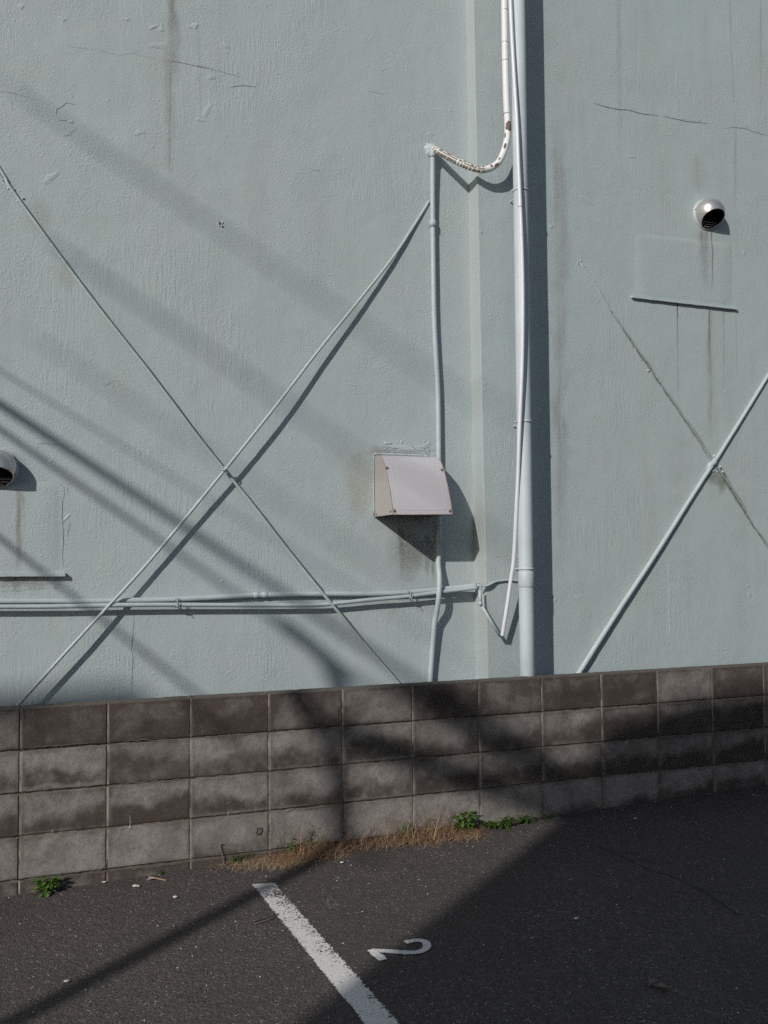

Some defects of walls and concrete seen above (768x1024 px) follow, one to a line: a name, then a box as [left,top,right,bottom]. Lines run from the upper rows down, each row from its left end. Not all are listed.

crack [594,103,767,136]
crack [611,311,767,545]